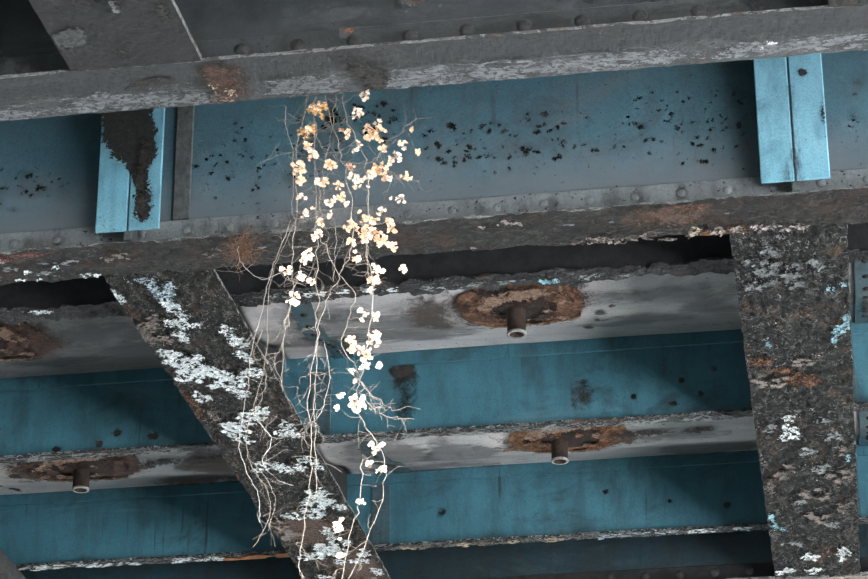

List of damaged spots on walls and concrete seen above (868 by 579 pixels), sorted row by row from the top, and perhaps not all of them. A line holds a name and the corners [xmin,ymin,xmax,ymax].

corrosion [199,61,250,103]
peeling [303,287,398,298]
peeling [614,418,667,427]
peeling [136,431,184,456]
peeling [0,440,110,492]